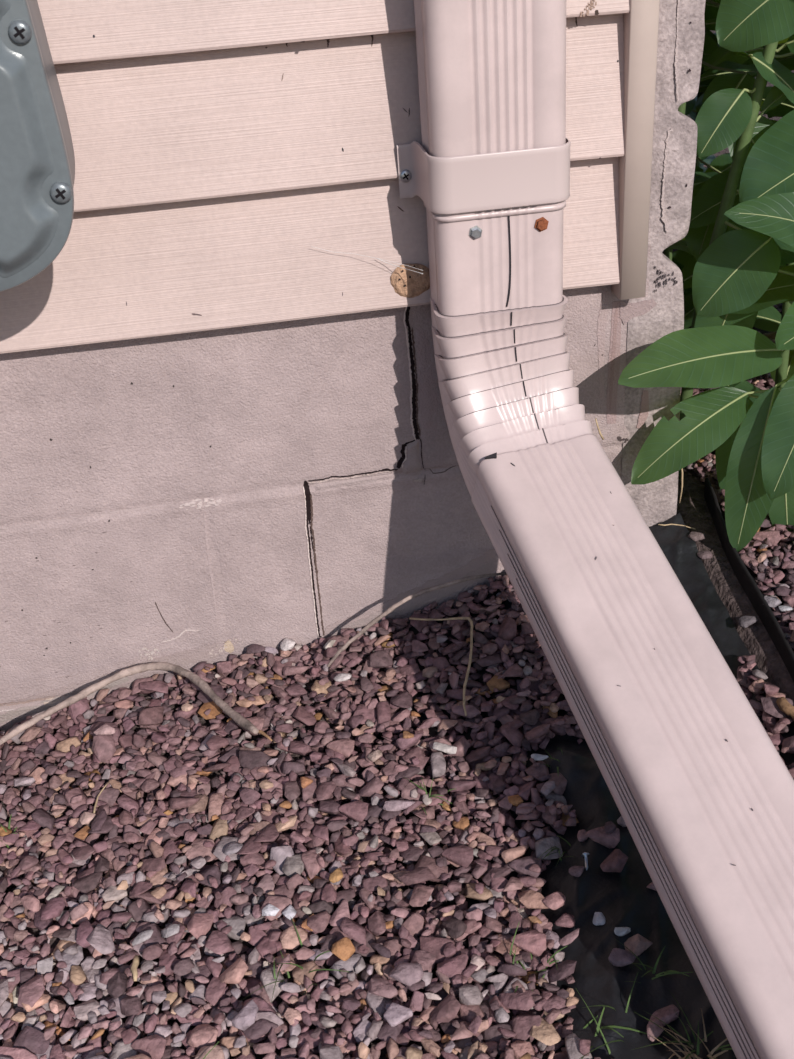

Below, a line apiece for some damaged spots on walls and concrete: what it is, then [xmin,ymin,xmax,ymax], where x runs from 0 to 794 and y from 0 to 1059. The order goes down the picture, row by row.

crack [303,306,458,637]